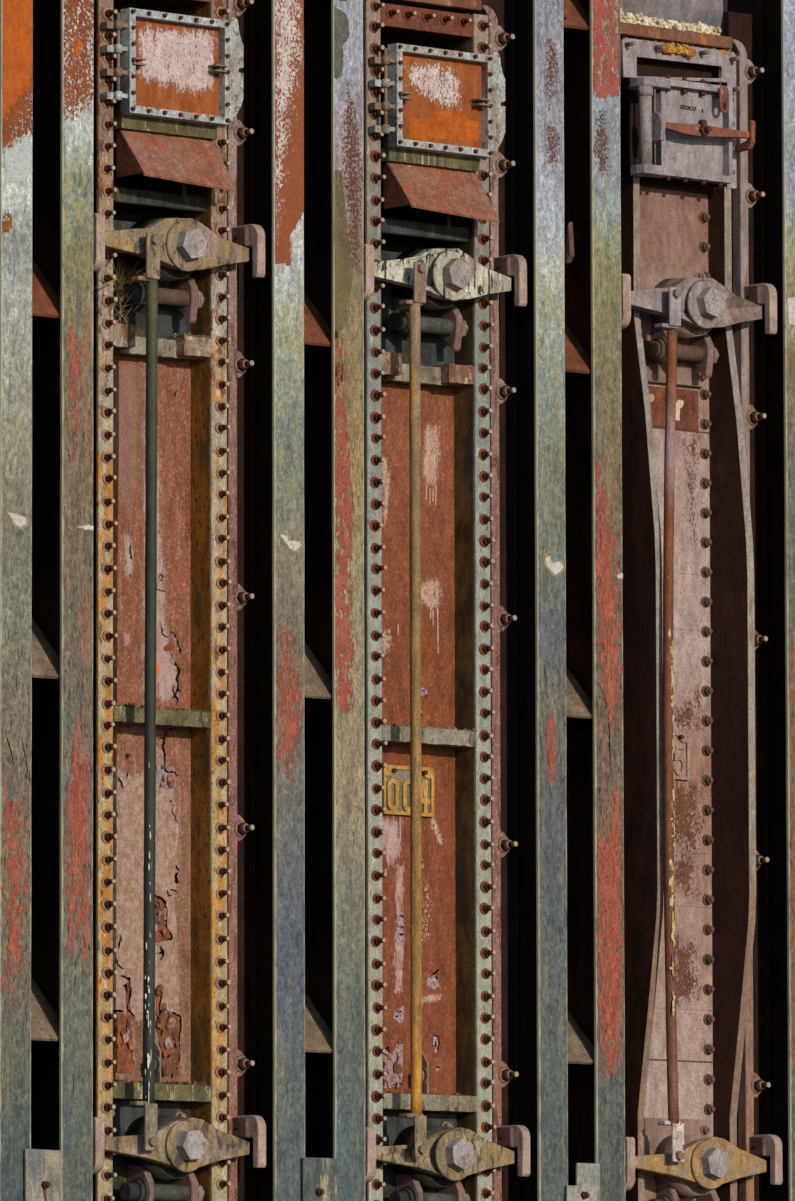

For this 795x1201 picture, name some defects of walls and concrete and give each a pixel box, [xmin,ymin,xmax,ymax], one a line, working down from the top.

corrosion [2,0,33,154]
corrosion [409,110,481,142]
peeling [595,451,623,727]
peeling [276,628,304,782]
spalling [394,913,404,945]
spalling [425,969,439,990]
spalling [393,1006,404,1024]